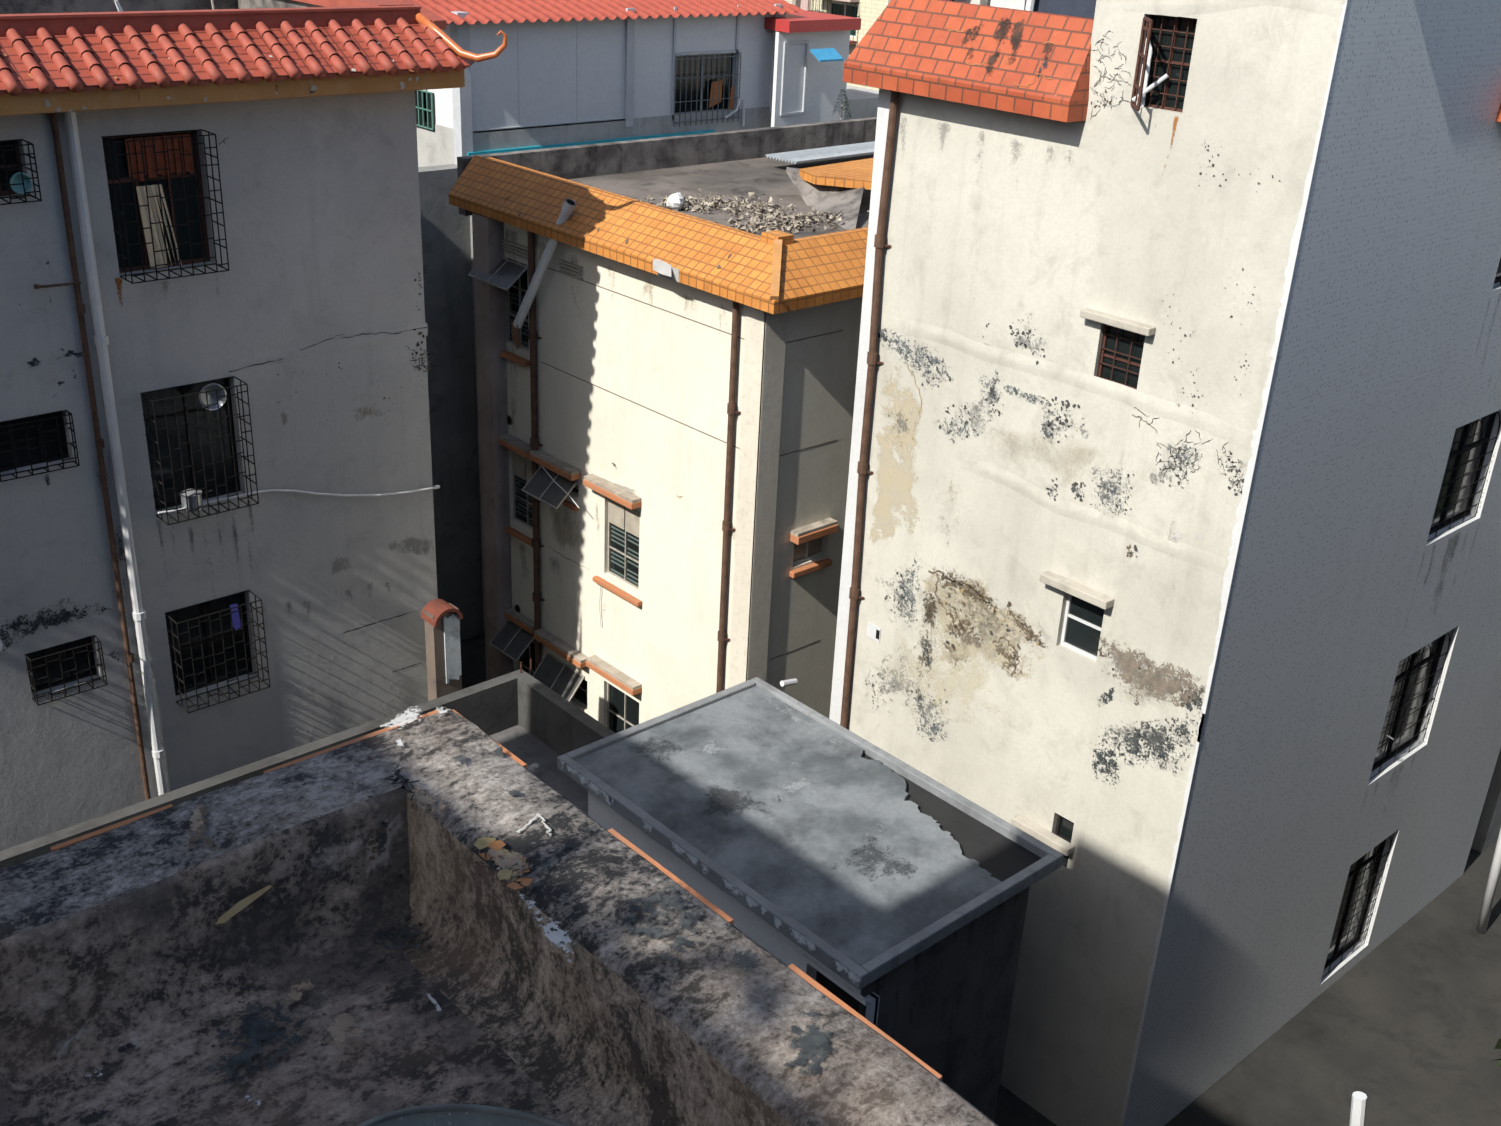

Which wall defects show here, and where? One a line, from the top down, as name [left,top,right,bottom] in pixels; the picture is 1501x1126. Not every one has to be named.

water stain [963,18,1024,73]
crack [229,327,427,372]
mould [878,328,952,388]
mould [1004,385,1084,443]
mould [884,559,920,626]
mould [0,599,109,654]
mould [1092,717,1202,785]
spalling [472,837,541,895]